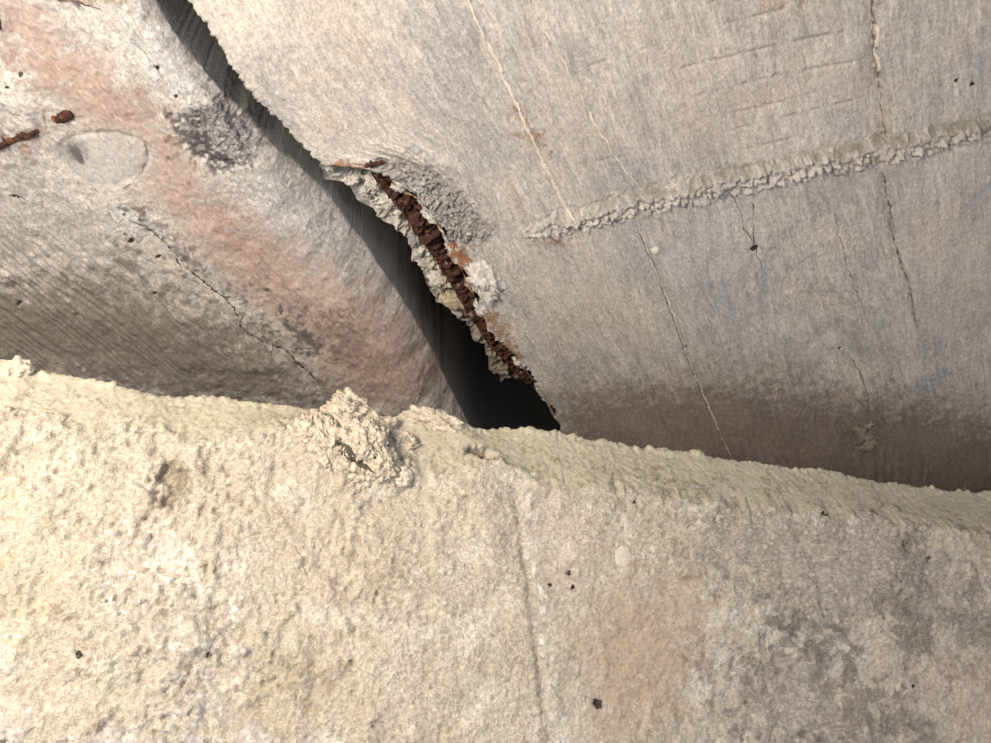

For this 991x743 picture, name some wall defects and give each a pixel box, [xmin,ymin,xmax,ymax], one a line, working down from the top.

crack [109,214,325,386]
rust [0,0,446,407]
spalling [319,148,559,422]
rust [447,240,471,286]
rust [484,309,523,360]
crack [510,472,566,743]
crack [0,706,273,743]